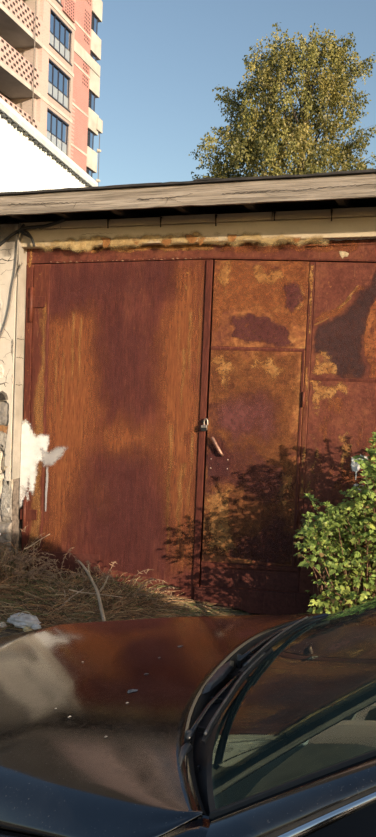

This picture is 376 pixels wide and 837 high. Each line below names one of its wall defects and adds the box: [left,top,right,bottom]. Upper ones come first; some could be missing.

crack [0,329,24,387]
rust [364,301,376,378]
rust [28,232,359,568]
rust [278,351,376,505]
flaking render [0,475,29,514]